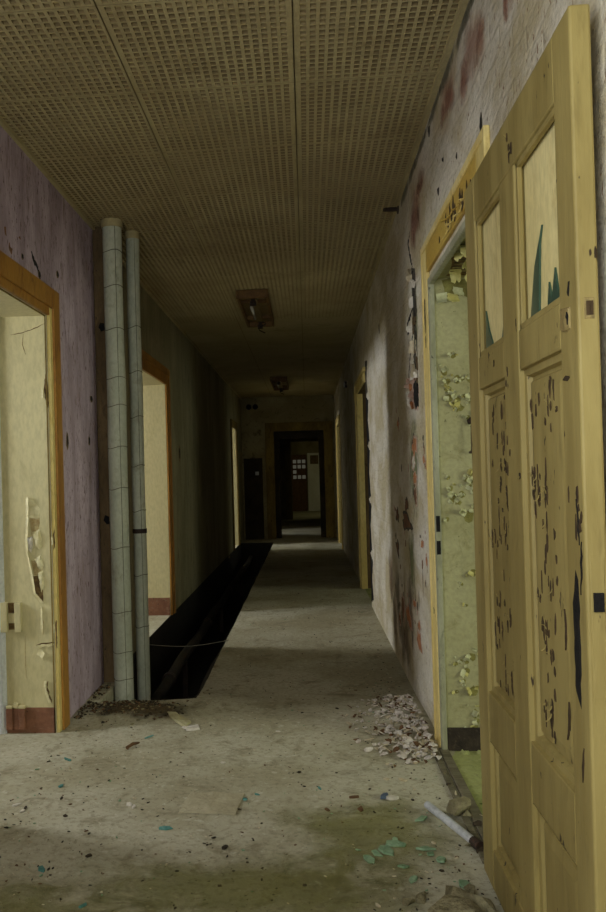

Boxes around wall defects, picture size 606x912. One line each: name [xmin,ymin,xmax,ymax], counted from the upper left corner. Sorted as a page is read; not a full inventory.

peeling [436,240,467,303]
flaking render [404,377,419,411]
peeling [439,351,471,427]
flaking render [394,432,428,569]
peeling [444,468,474,523]
peeling [450,648,480,728]